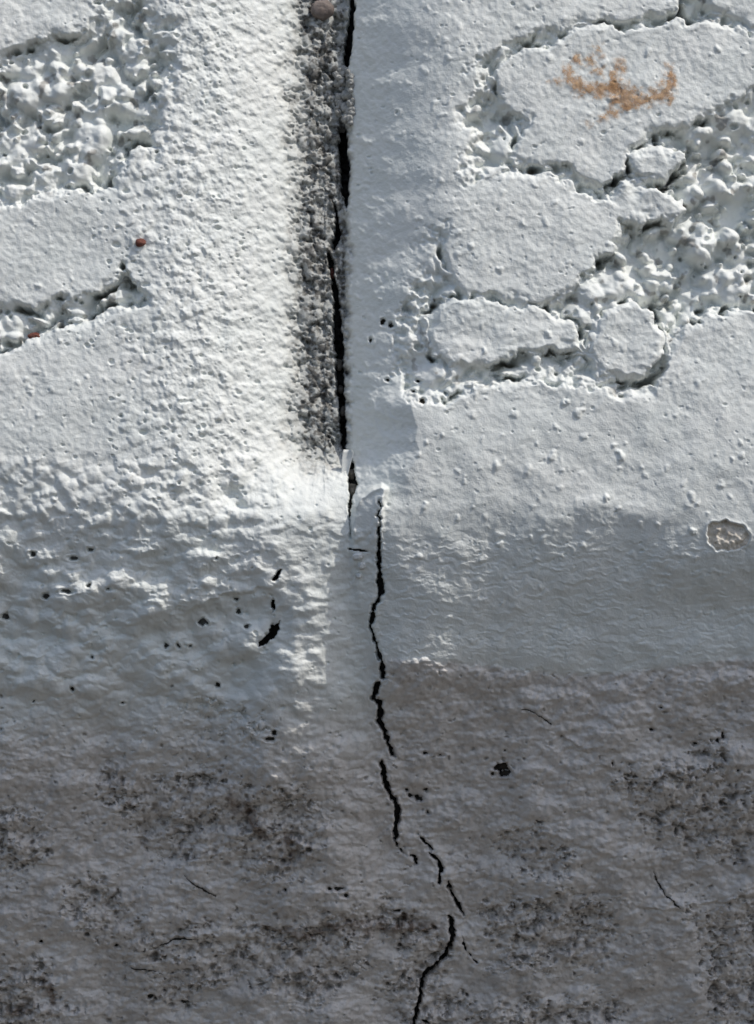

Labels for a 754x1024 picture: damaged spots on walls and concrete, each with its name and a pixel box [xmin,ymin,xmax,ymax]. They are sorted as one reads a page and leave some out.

crack [344,0,356,67]
spalling [0,0,173,205]
rust [555,47,676,118]
spalling [381,0,754,405]
spalling [0,265,147,354]
crack [327,130,478,1024]
peeling [707,520,750,551]